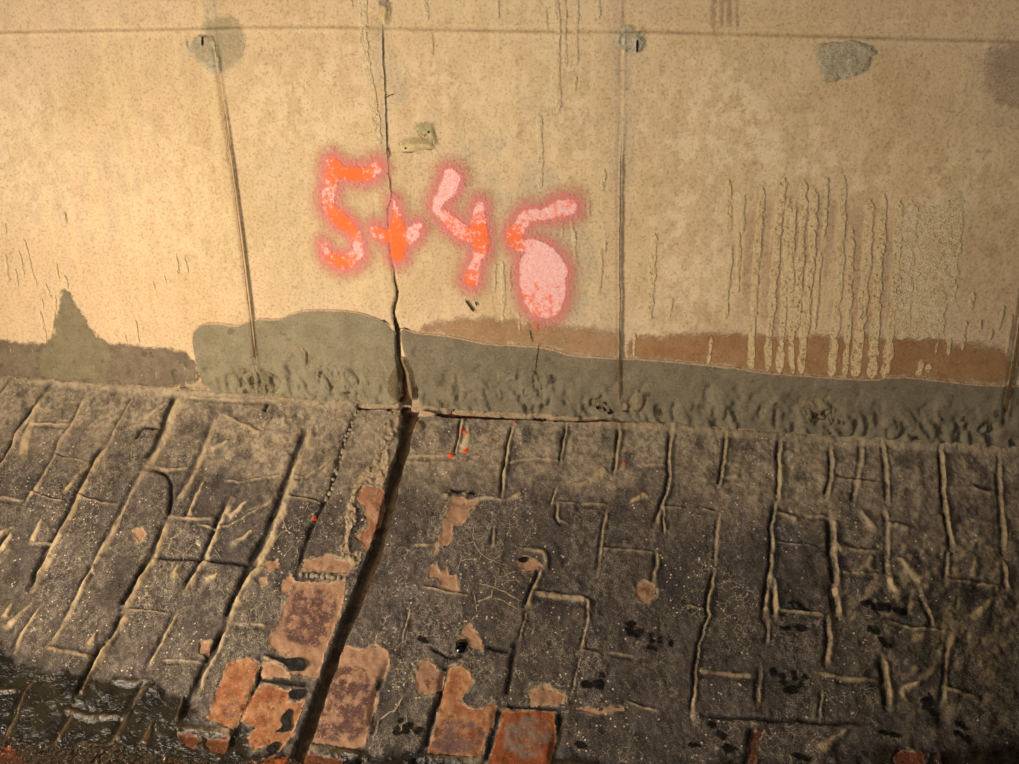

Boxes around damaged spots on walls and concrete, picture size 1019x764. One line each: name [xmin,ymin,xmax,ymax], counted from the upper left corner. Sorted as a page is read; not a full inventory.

crack [220,92,256,363]
crack [293,25,635,764]
leakage [0,174,1019,448]
peeling [177,409,404,764]
peeling [428,496,479,593]
peeling [415,659,624,764]
peeling [893,749,926,764]